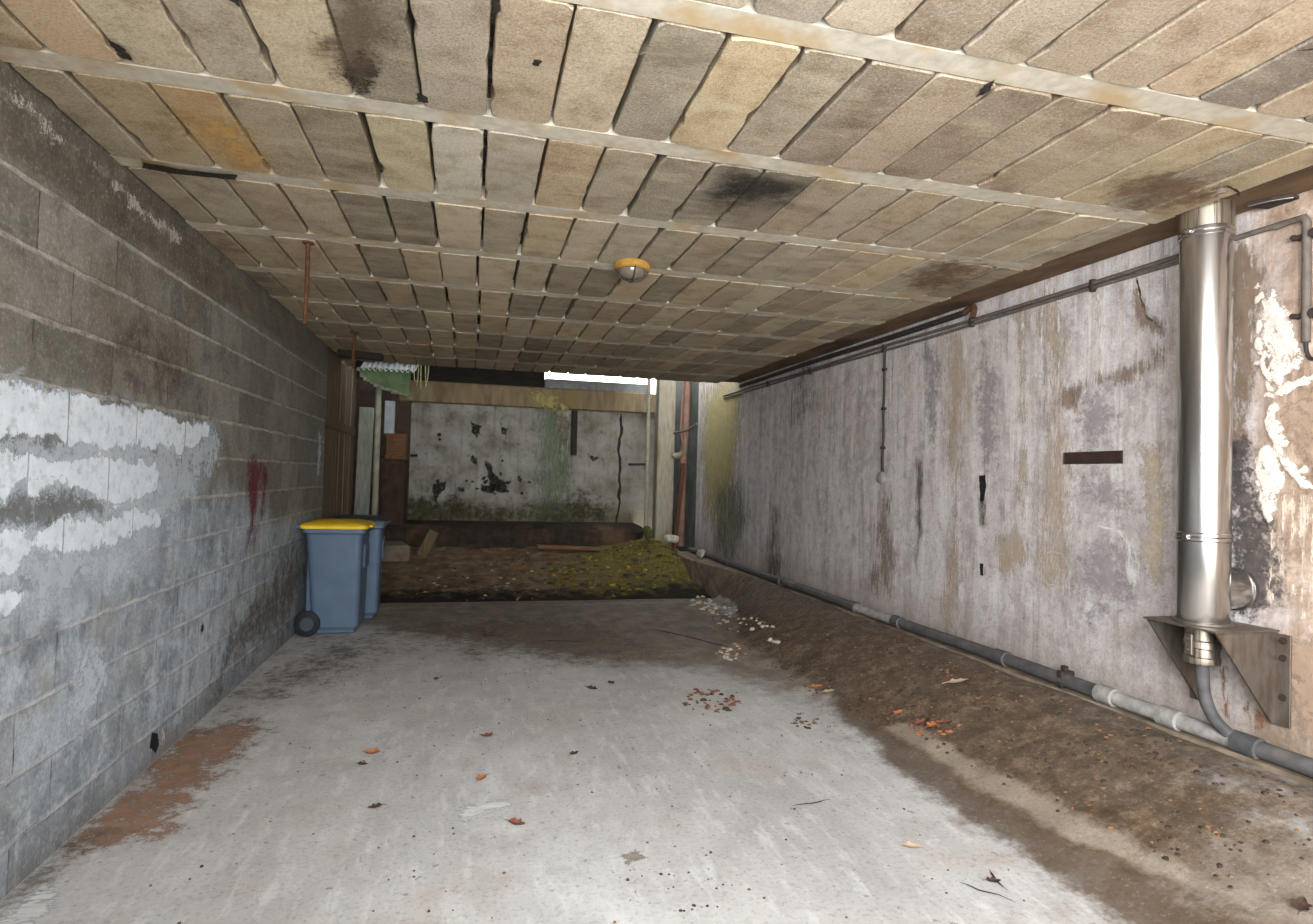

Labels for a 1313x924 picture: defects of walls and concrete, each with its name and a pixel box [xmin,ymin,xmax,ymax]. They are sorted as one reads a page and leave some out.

water stain [319,0,396,96]
water stain [1109,171,1223,210]
water stain [902,260,987,290]
flaking render [1253,283,1313,523]
peeling [0,365,223,626]
crack [615,414,623,522]
spalling [150,725,167,753]